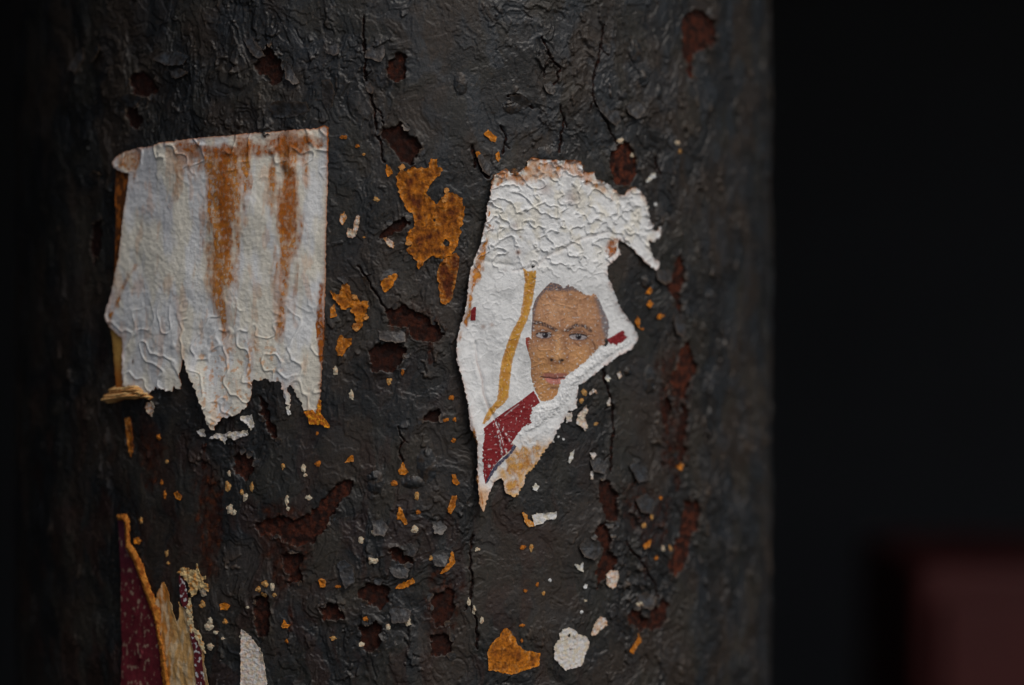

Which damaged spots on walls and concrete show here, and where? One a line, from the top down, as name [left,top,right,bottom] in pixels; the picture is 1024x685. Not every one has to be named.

rust [681,9,717,84]
crack [362,16,386,163]
crack [540,36,567,153]
crack [589,24,618,144]
crack [471,126,510,179]
rust [379,211,414,238]
peeling [378,329,406,343]
peeling [359,519,389,544]
peeling [369,525,419,579]
peeling [432,520,447,535]
peeling [386,606,412,630]
crack [464,535,480,650]